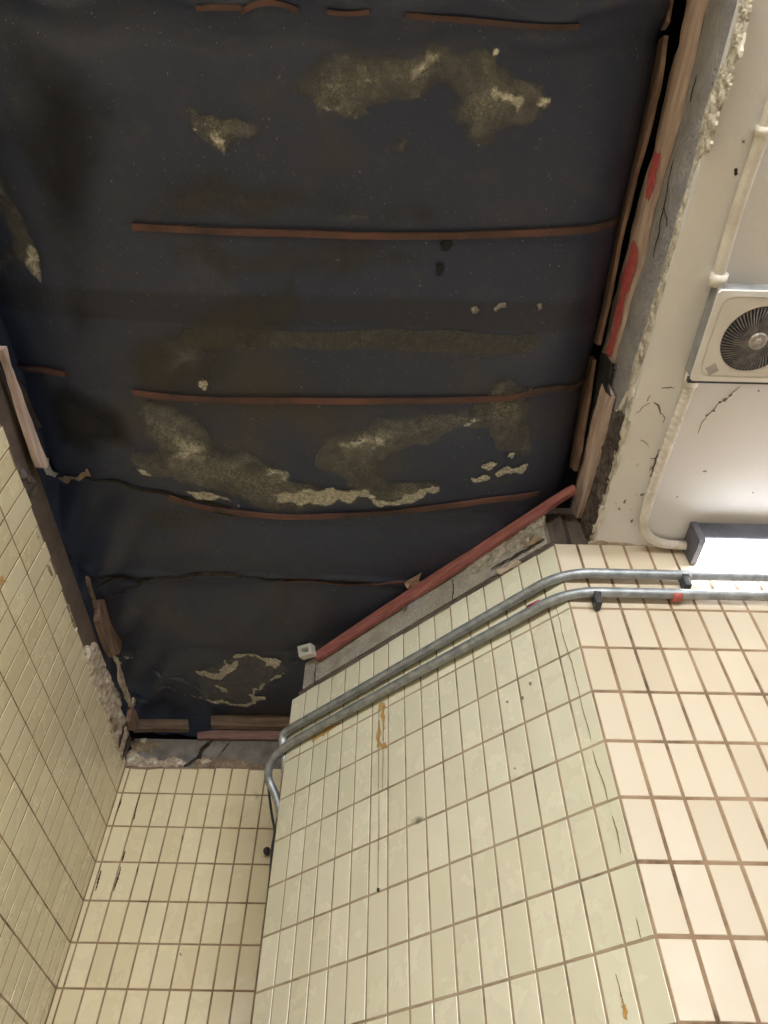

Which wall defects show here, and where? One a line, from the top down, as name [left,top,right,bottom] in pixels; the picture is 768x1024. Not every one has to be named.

water stain [299,44,551,144]
water stain [189,108,258,150]
crack [653,162,673,258]
flaking render [580,0,753,546]
crack [638,387,673,423]
water stain [131,380,530,512]
crack [641,440,659,477]
crack [79,474,238,516]
crack [96,572,290,595]
flaking render [84,642,265,770]
corrosion [376,703,387,749]
crack [184,740,230,766]